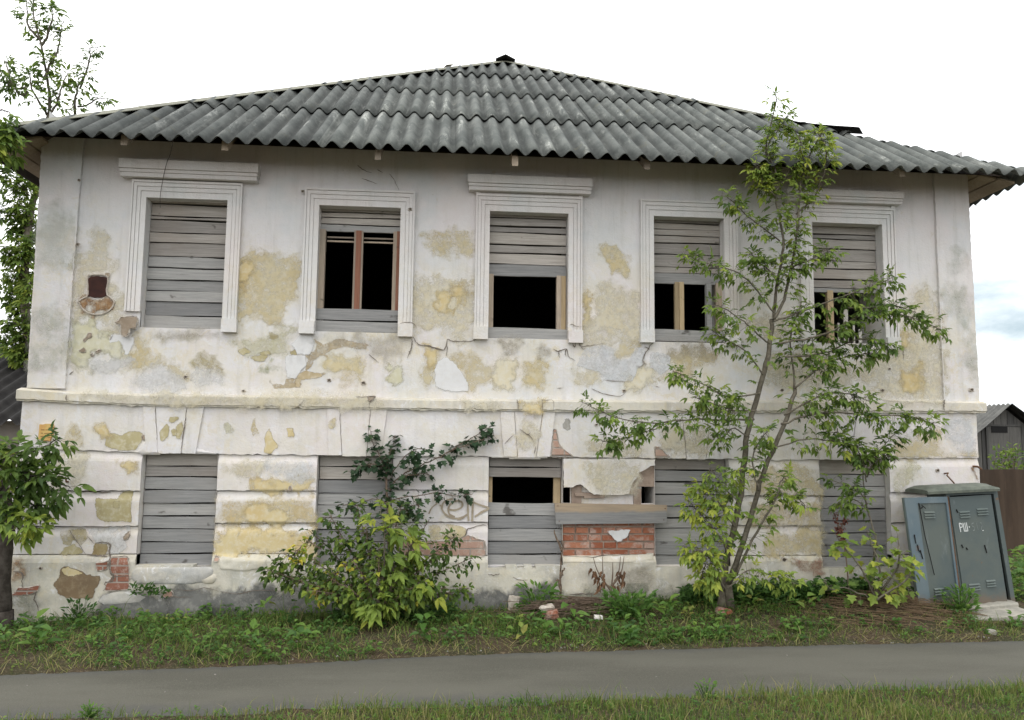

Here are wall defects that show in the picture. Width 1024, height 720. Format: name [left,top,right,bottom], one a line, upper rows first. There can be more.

peeling [68,273,222,380]
peeling [151,251,383,441]
peeling [413,274,475,341]
peeling [580,245,640,358]
peeling [55,427,88,484]
peeling [53,490,133,599]
peeling [94,422,145,474]
peeling [214,420,317,562]
peeling [420,343,574,459]
spalling [569,485,605,503]
flaking render [563,523,654,556]
peeling [589,424,710,505]